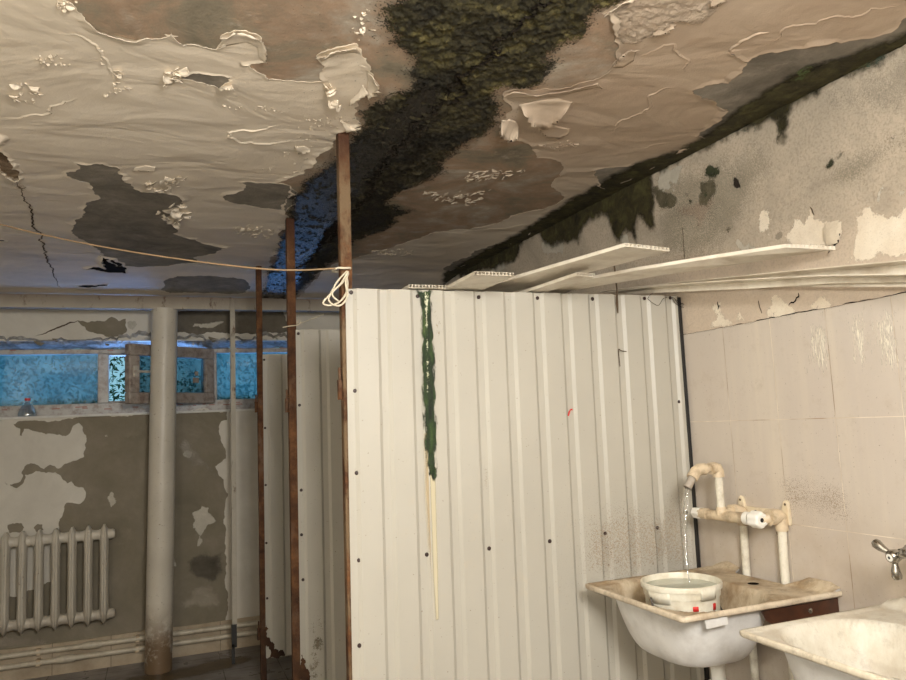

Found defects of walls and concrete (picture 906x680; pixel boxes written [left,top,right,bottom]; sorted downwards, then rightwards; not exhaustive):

crack [16,182,58,286]
peeling [56,0,424,299]
leakage [253,148,338,299]
leakage [349,0,624,246]
peeling [352,0,628,260]
leakage [442,33,906,284]
crack [683,291,906,335]
flaking render [0,412,149,650]
flaking render [173,408,230,627]
leakage [128,655,254,680]
rust [260,625,285,659]
rust [298,655,310,680]